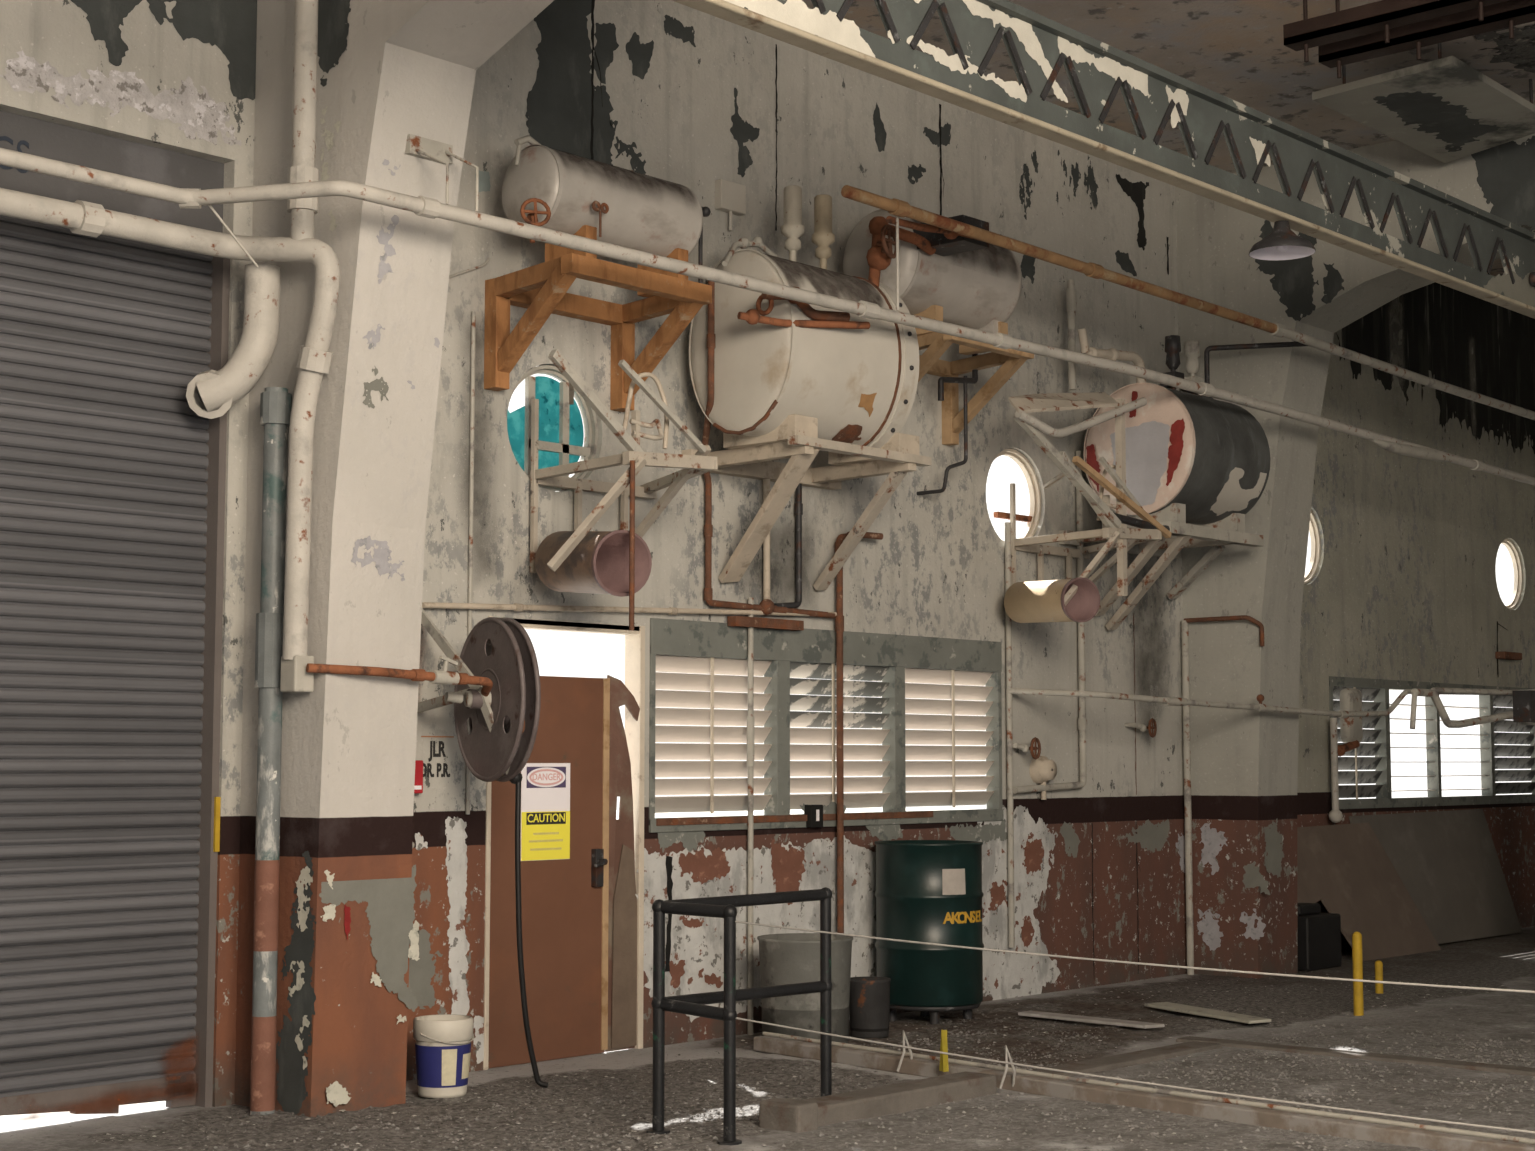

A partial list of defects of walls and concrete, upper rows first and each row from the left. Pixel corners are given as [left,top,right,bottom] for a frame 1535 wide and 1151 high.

peeling [71,0,257,100]
peeling [317,0,351,87]
peeling [525,0,696,174]
peeling [730,88,760,177]
spalling [1474,24,1535,73]
peeling [1471,136,1535,231]
peeling [1255,232,1344,321]
peeling [1336,282,1535,454]
peeling [276,816,484,1115]
flaking render [635,810,903,1022]
flaking render [945,805,1081,1000]
rust [18,1040,196,1121]